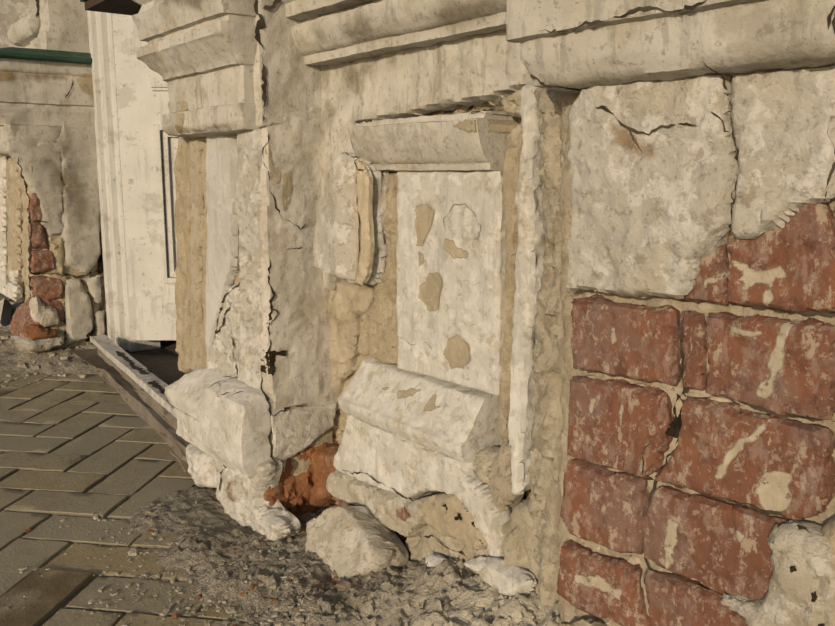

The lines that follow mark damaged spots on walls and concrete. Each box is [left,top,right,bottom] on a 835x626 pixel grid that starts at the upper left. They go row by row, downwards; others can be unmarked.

crack [541,0,706,33]
crack [827,6,835,33]
crack [595,63,739,236]
crack [824,124,835,201]
crack [17,158,104,334]
crack [211,0,306,471]
peeling [415,204,434,266]
peeling [419,272,442,311]
peeling [763,290,774,306]
peeling [444,335,470,369]
peeling [731,326,762,337]
spalling [309,443,339,509]